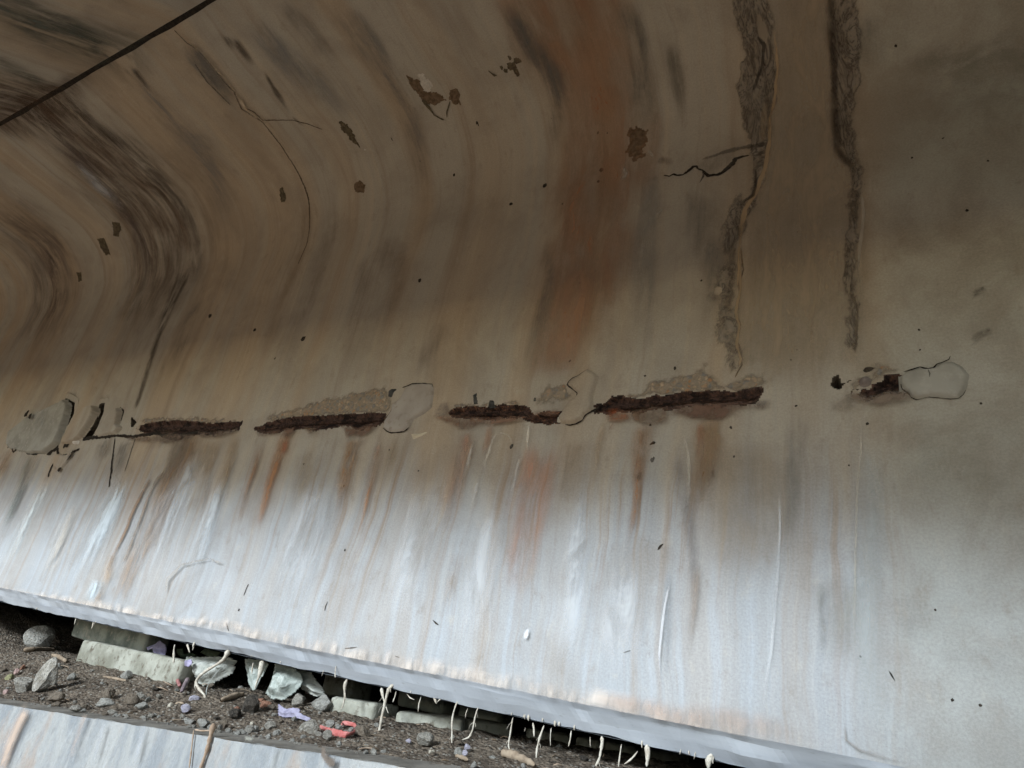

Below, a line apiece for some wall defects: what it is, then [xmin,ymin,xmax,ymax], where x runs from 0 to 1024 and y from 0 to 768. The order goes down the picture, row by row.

crack [174,30,322,264]
crack [664,155,749,182]
spalling [129,388,396,446]
spalling [438,385,569,433]
spalling [584,367,774,429]
spalling [840,364,917,425]
corrosion [116,441,193,556]